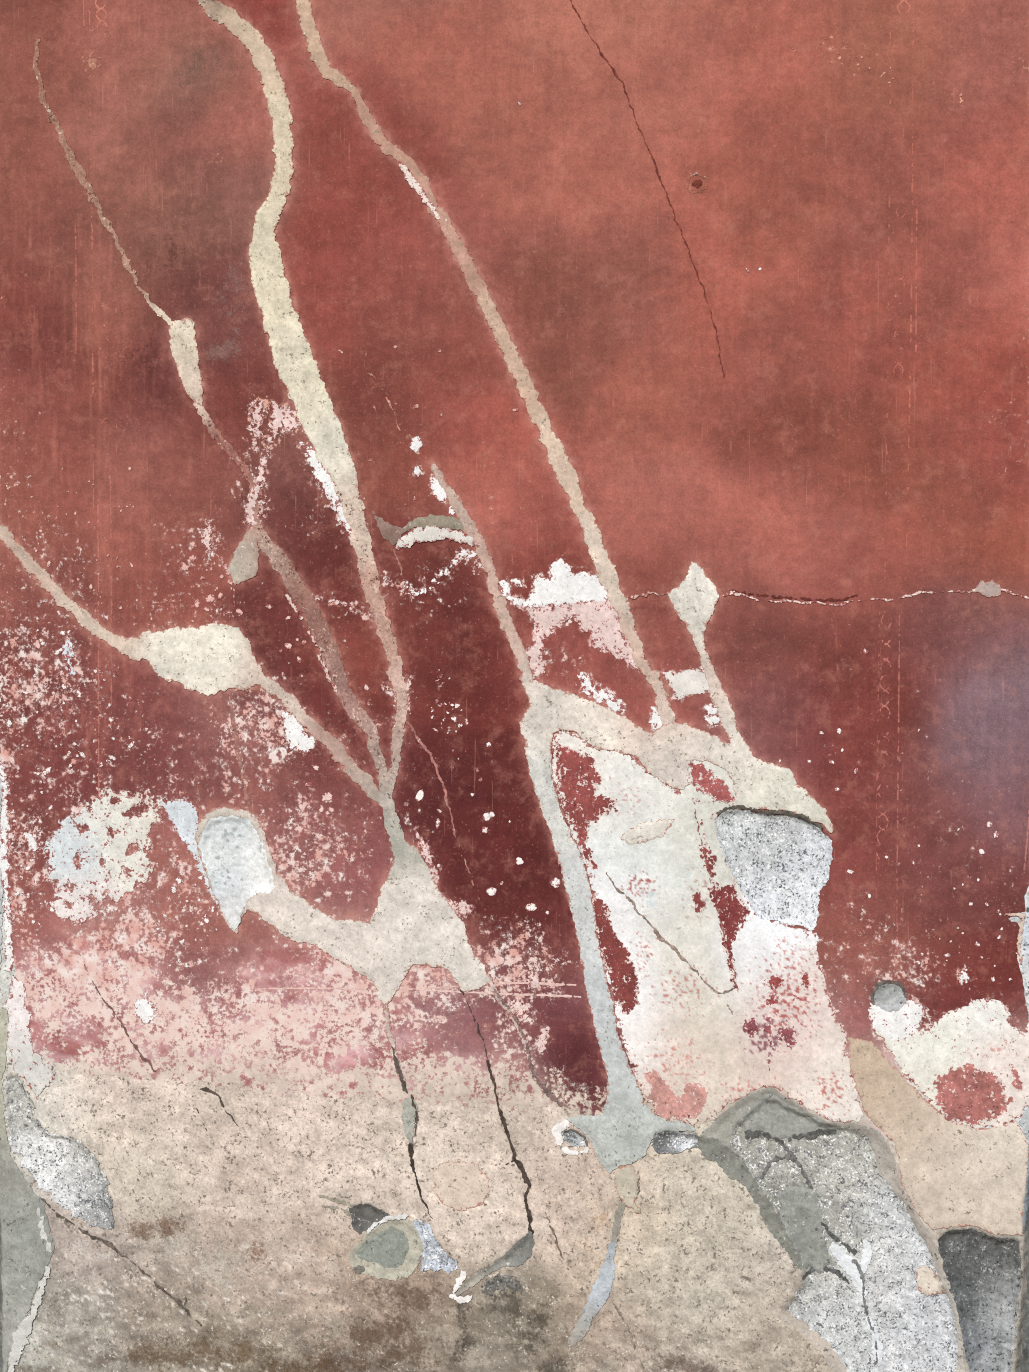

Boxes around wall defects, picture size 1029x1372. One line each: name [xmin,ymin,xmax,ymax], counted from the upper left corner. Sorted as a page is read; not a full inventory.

crack [570,0,725,378]
crack [0,0,474,886]
peeling [243,399,351,539]
peeling [410,436,455,516]
crack [296,0,676,725]
peeling [499,558,638,676]
peeling [577,672,626,712]
peeling [663,668,720,727]
crack [723,580,1029,606]
crack [384,1004,432,1218]
flaking render [0,703,1029,1372]
crack [460,974,569,1270]